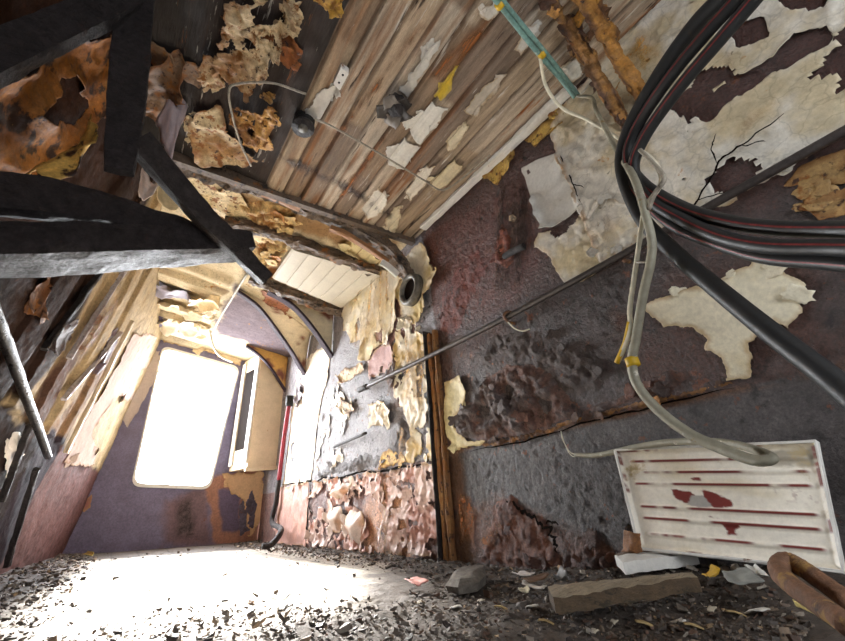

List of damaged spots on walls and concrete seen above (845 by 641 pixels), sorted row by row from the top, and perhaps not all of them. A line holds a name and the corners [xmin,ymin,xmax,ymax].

peeling [0,34,112,180]
peeling [145,0,304,168]
peeling [521,54,646,283]
crack [694,114,783,205]
peeling [640,0,845,221]
peeling [273,241,437,557]
rust [447,325,733,447]
crack [473,388,734,451]
peeling [646,286,757,381]
peeling [721,262,816,328]
rust [238,490,257,536]
rust [459,495,643,571]